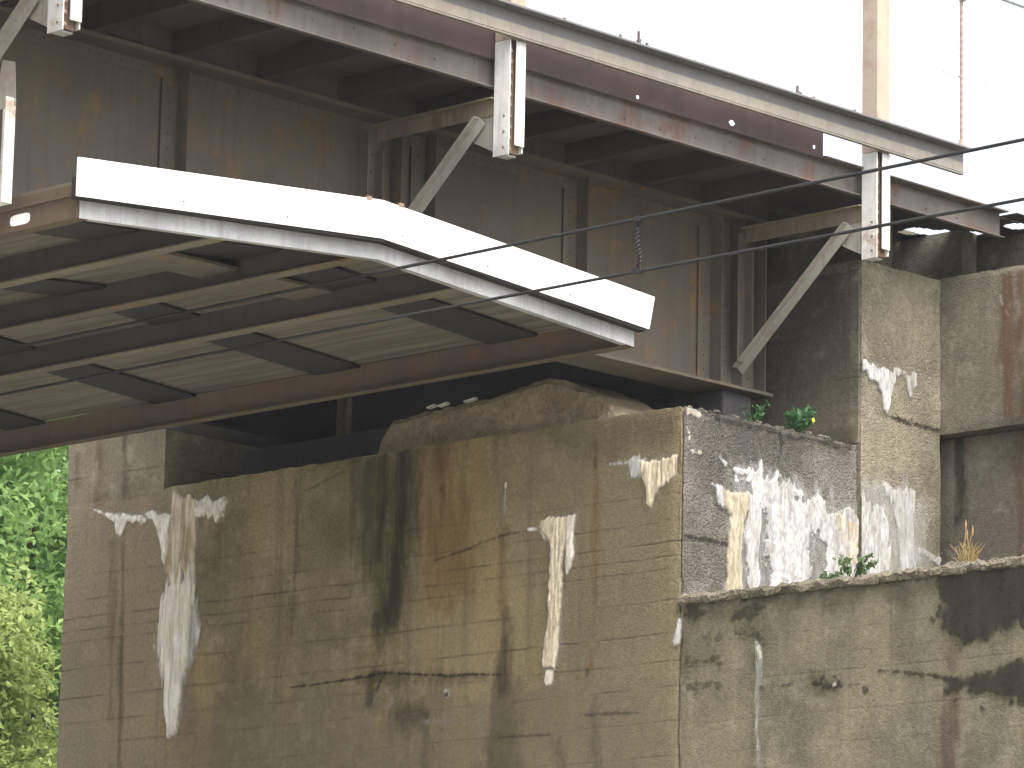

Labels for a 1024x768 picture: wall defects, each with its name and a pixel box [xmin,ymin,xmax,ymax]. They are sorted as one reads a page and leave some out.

efflorescence [862,359,917,413]
leakage [94,490,227,738]
leakage [353,451,418,625]
efflorescence [527,515,574,685]
efflorescence [612,455,678,507]
efflorescence [712,458,942,590]